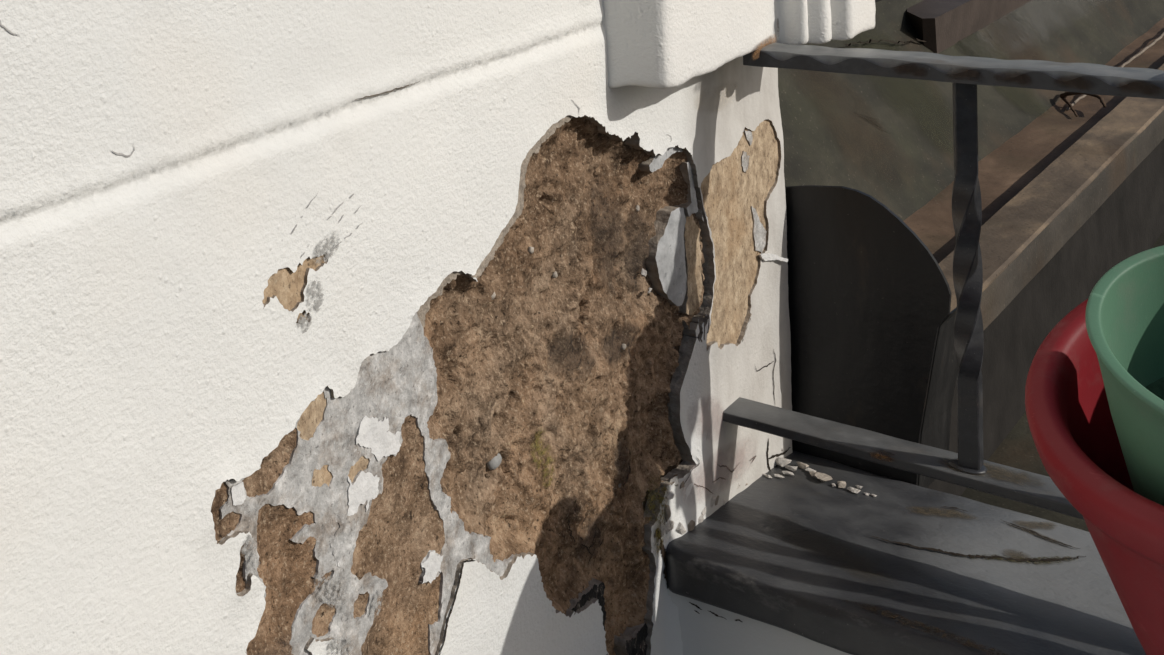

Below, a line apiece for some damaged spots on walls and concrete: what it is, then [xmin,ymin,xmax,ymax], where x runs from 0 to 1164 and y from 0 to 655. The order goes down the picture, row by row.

flaking render [211,115,788,655]
crack [866,521,1086,564]